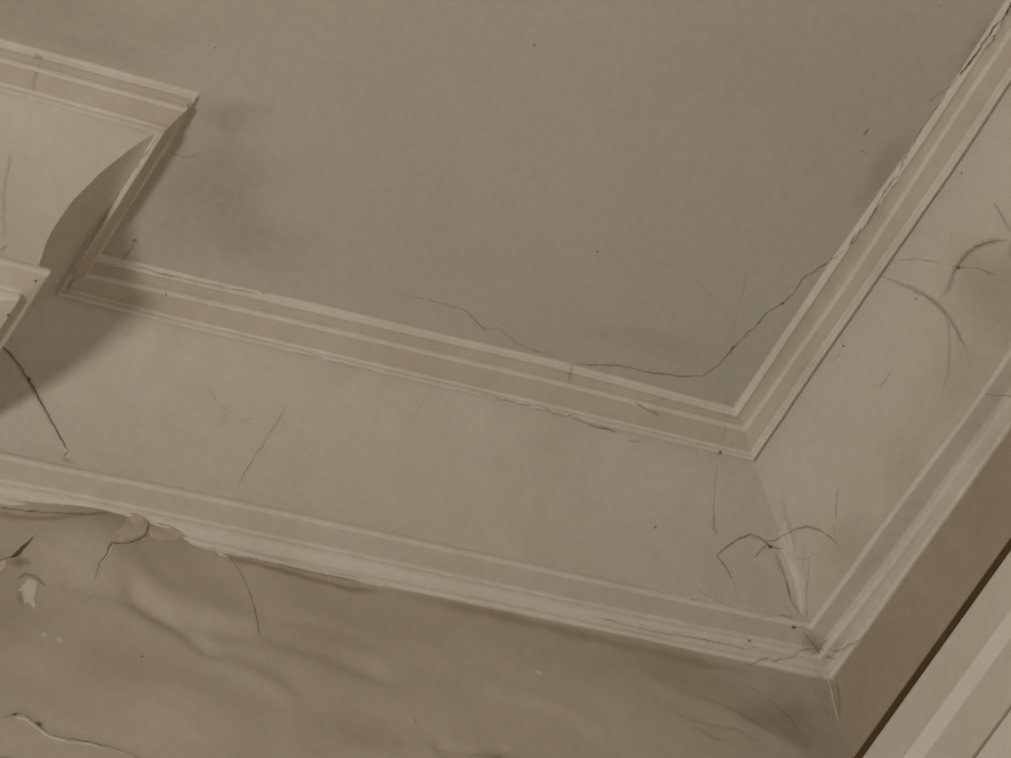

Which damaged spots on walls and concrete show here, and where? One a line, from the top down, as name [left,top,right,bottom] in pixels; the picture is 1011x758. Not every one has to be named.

spalling [0,537,33,572]
peeling [19,580,37,610]